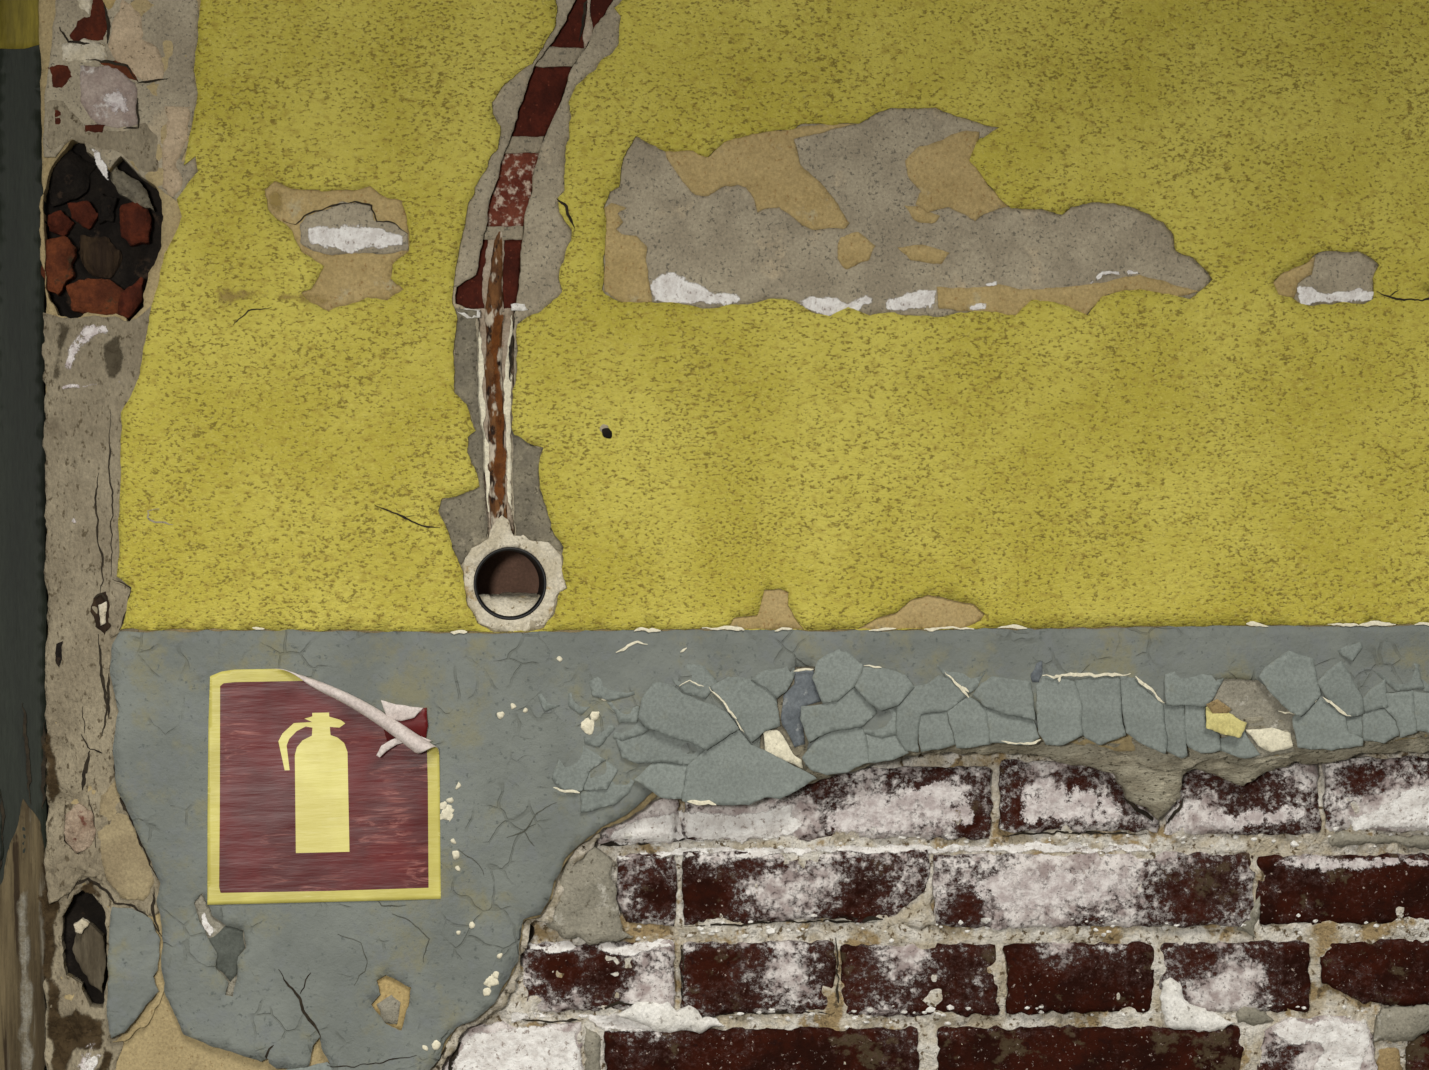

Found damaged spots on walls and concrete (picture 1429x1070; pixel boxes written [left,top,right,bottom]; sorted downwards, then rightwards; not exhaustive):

peeling [264,181,410,311]
peeling [602,108,1212,317]
crack [1377,290,1429,301]
flaking render [0,0,199,1070]
crack [508,803,554,846]
leakage [611,774,1153,915]
flaking render [422,621,1429,1070]
leakage [1186,803,1309,832]
leakage [1276,854,1428,873]
crack [378,901,430,962]
crack [278,969,417,1068]
leakage [452,1012,653,1070]